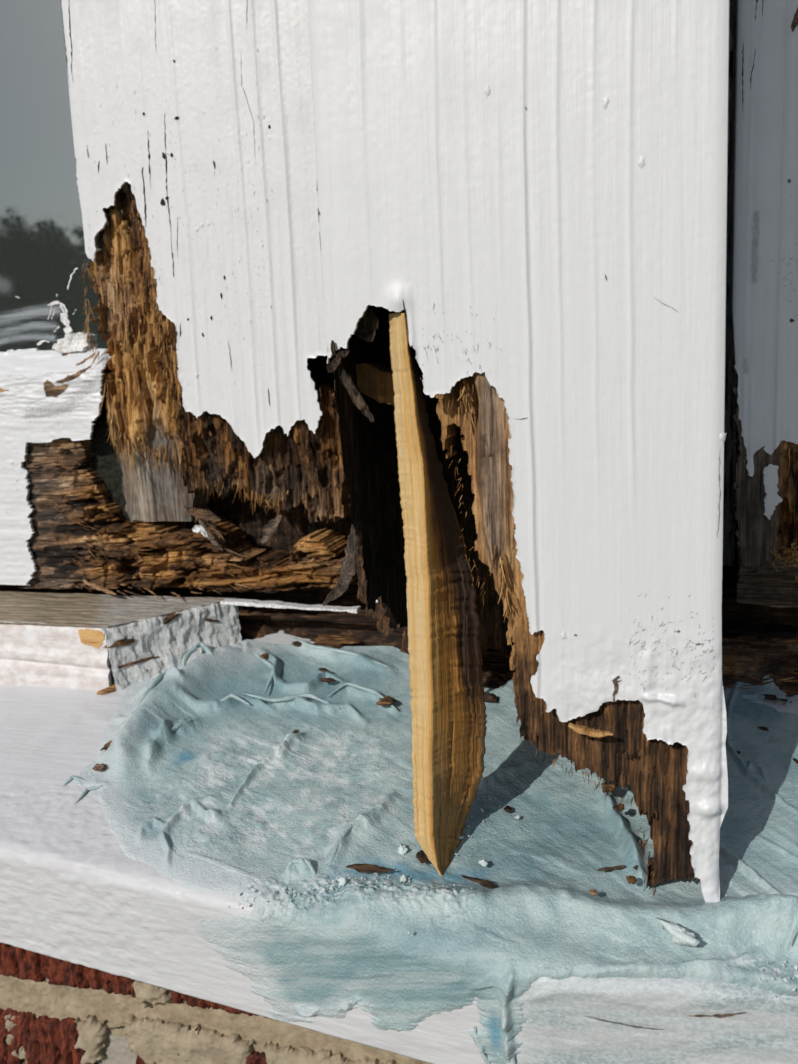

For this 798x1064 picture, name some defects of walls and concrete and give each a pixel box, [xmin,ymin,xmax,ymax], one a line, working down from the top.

peeling [43,353,95,397]